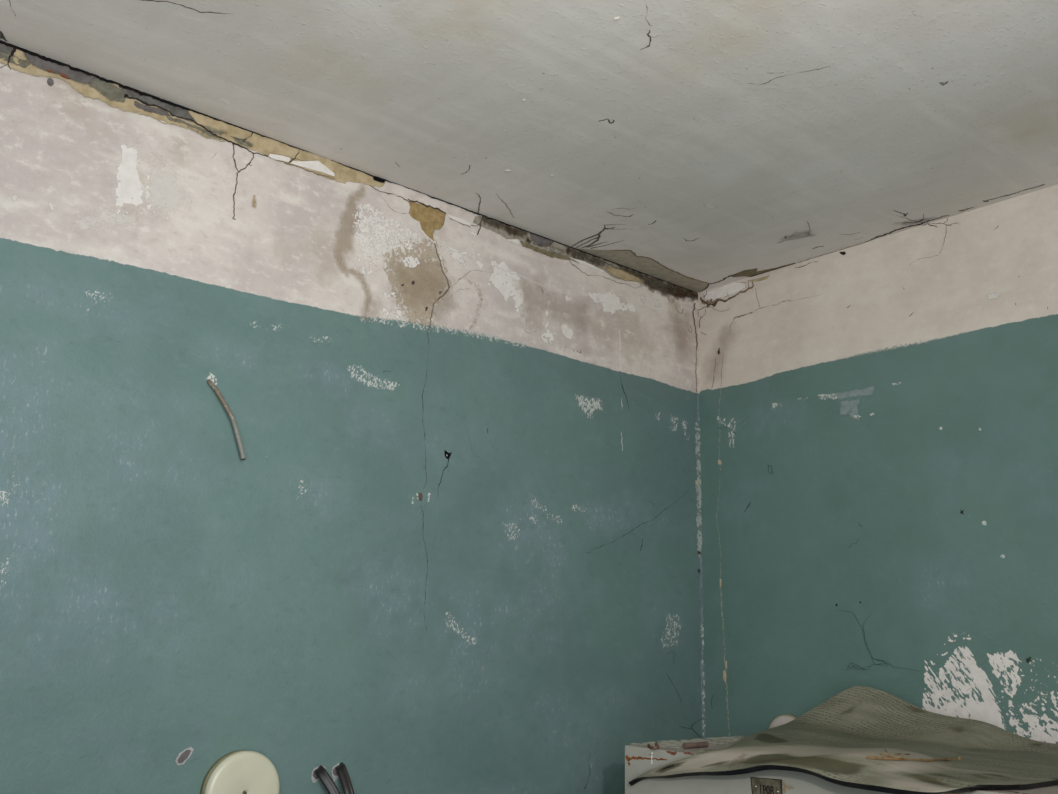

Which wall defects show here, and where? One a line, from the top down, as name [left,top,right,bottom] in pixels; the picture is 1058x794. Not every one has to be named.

spalling [0,43,386,187]
peeling [81,144,189,227]
leakage [384,239,451,328]
spalling [352,199,795,344]
crack [791,184,1045,268]
crack [0,0,818,737]
peeling [817,394,875,420]
peeling [922,633,1058,744]